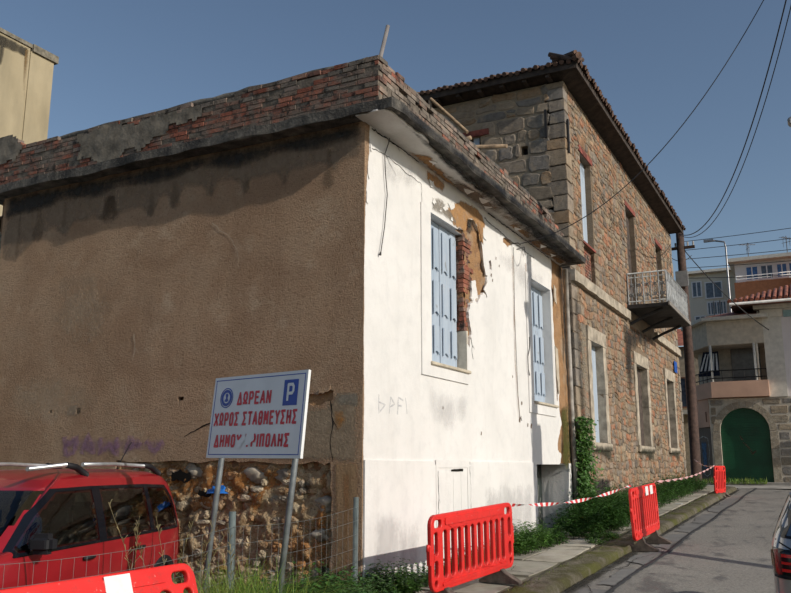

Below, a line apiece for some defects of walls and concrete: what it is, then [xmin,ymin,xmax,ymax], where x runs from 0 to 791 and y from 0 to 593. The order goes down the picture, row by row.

damp [0,35,28,67]
damp [4,133,359,259]
crack [372,128,422,196]
spalling [412,153,493,336]
crack [330,401,338,462]
spalling [118,460,333,593]